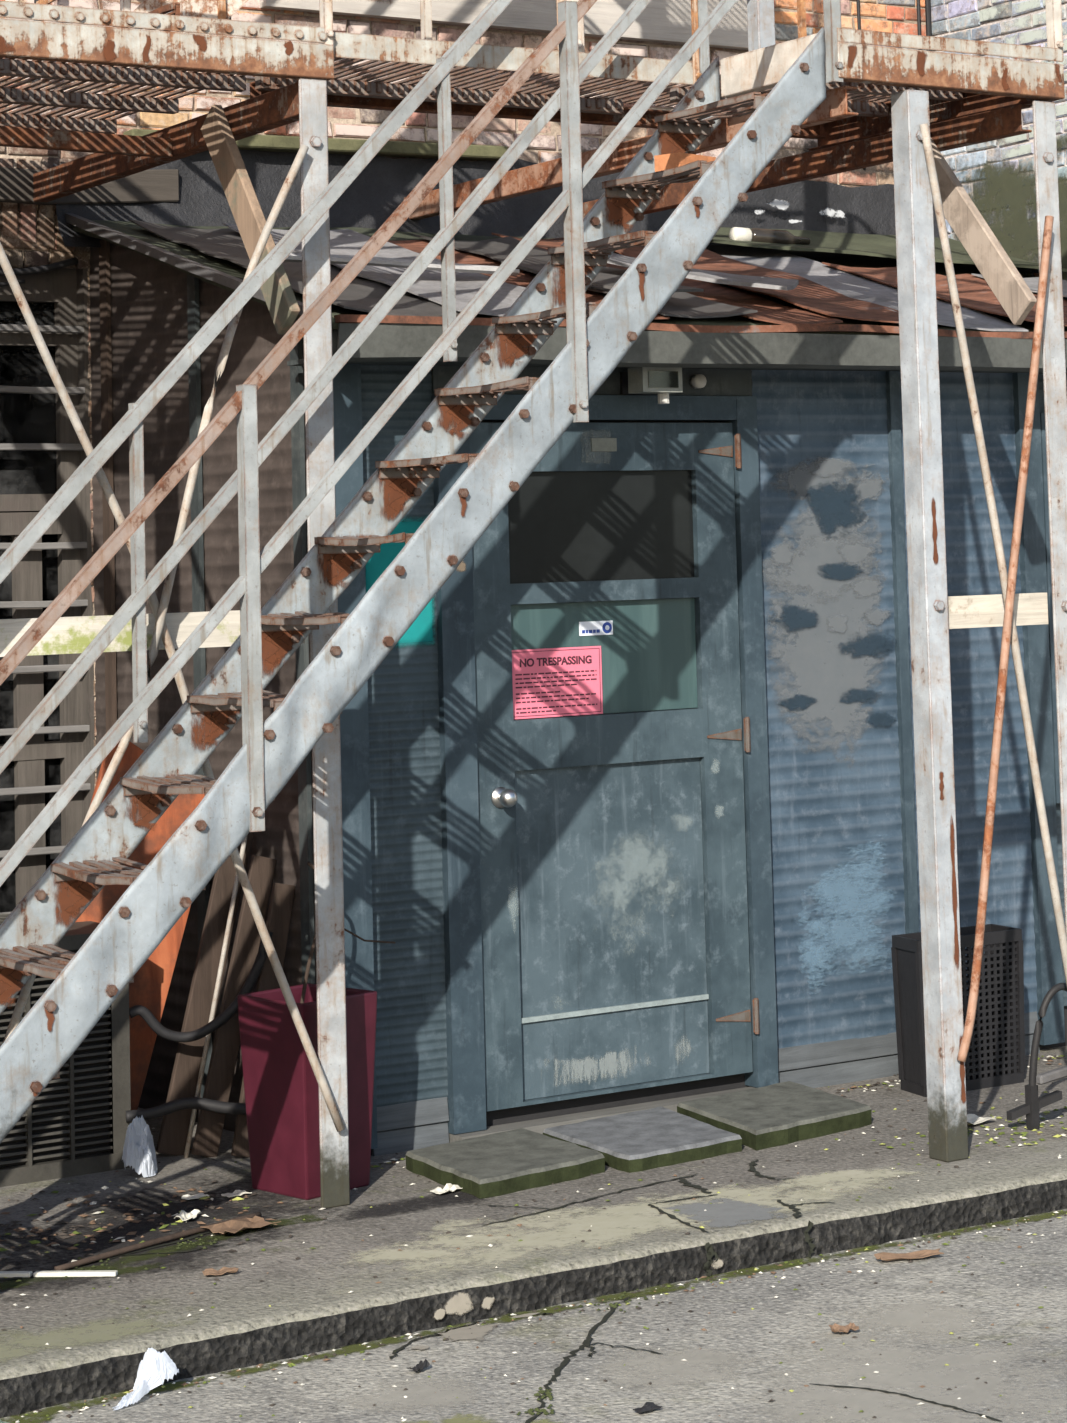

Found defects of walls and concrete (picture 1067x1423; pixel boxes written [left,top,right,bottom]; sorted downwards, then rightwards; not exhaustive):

corrosion [142,36,151,63]
corrosion [193,34,207,52]
corrosion [848,45,857,68]
corrosion [917,51,928,76]
corrosion [437,397,482,439]
corrosion [378,466,432,520]
corrosion [317,535,368,587]
peeling [762,457,897,762]
corrosion [261,630,306,675]
corrosion [191,710,240,750]
crack [389,1289,662,1423]
crack [809,1383,1001,1421]